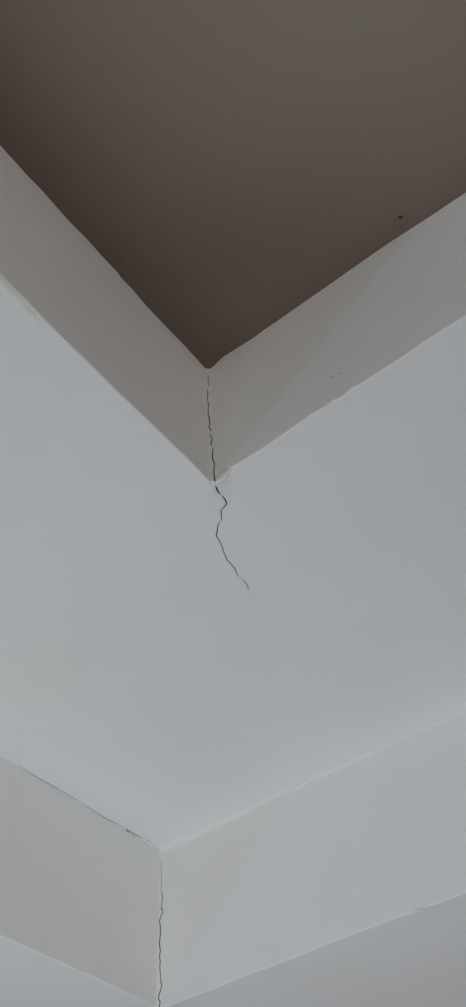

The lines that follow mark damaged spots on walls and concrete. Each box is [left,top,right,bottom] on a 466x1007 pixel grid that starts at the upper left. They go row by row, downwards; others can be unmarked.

crack [207,377,250,595]
crack [18,765,163,1007]